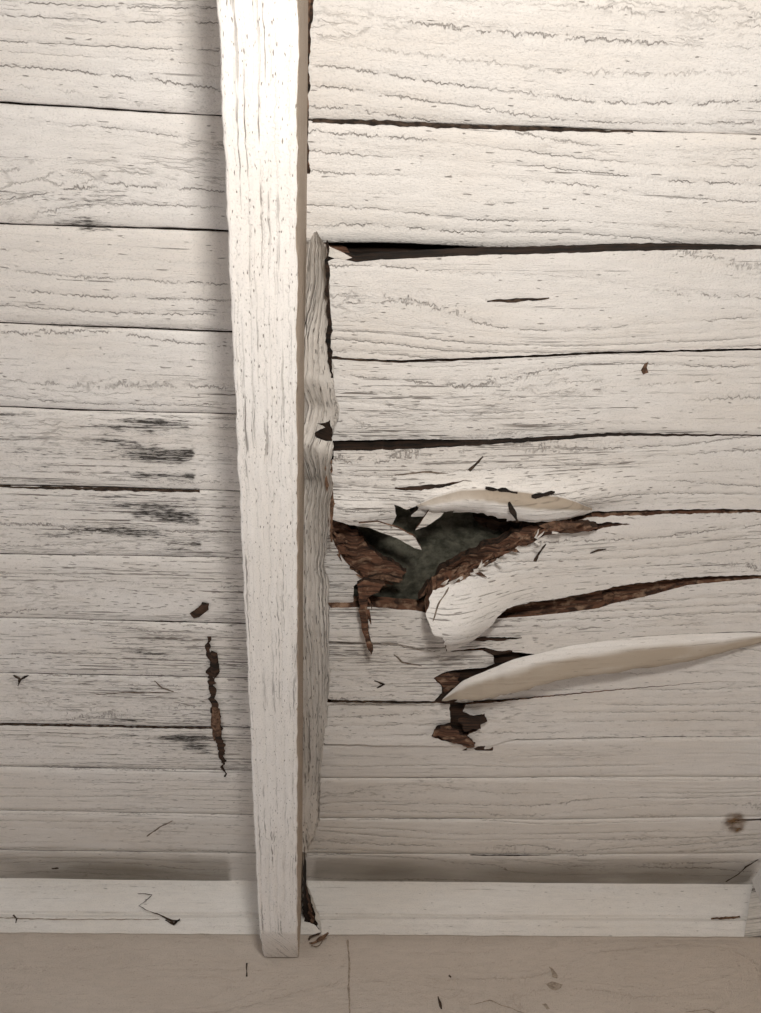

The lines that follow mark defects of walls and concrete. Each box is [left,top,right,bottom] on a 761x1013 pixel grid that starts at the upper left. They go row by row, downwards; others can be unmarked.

peeling [359,510,444,550]
spalling [418,513,598,599]
peeling [433,713,487,748]